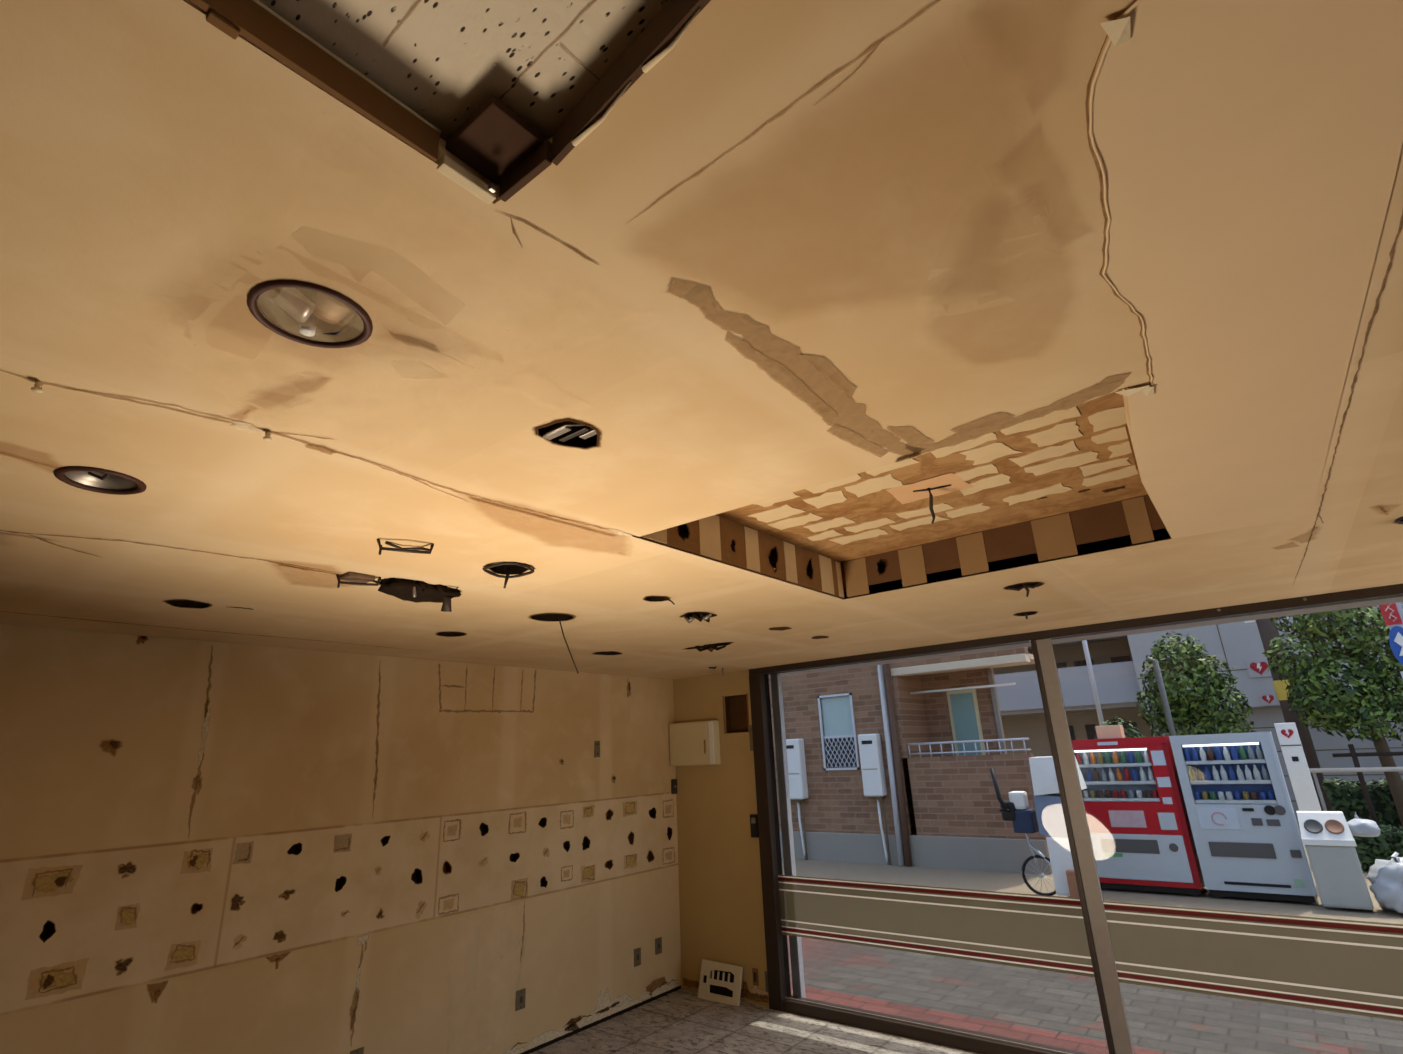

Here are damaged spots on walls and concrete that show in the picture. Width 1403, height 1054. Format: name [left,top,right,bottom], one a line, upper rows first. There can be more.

crack [635,0,940,218]
crack [1295,211,1403,579]